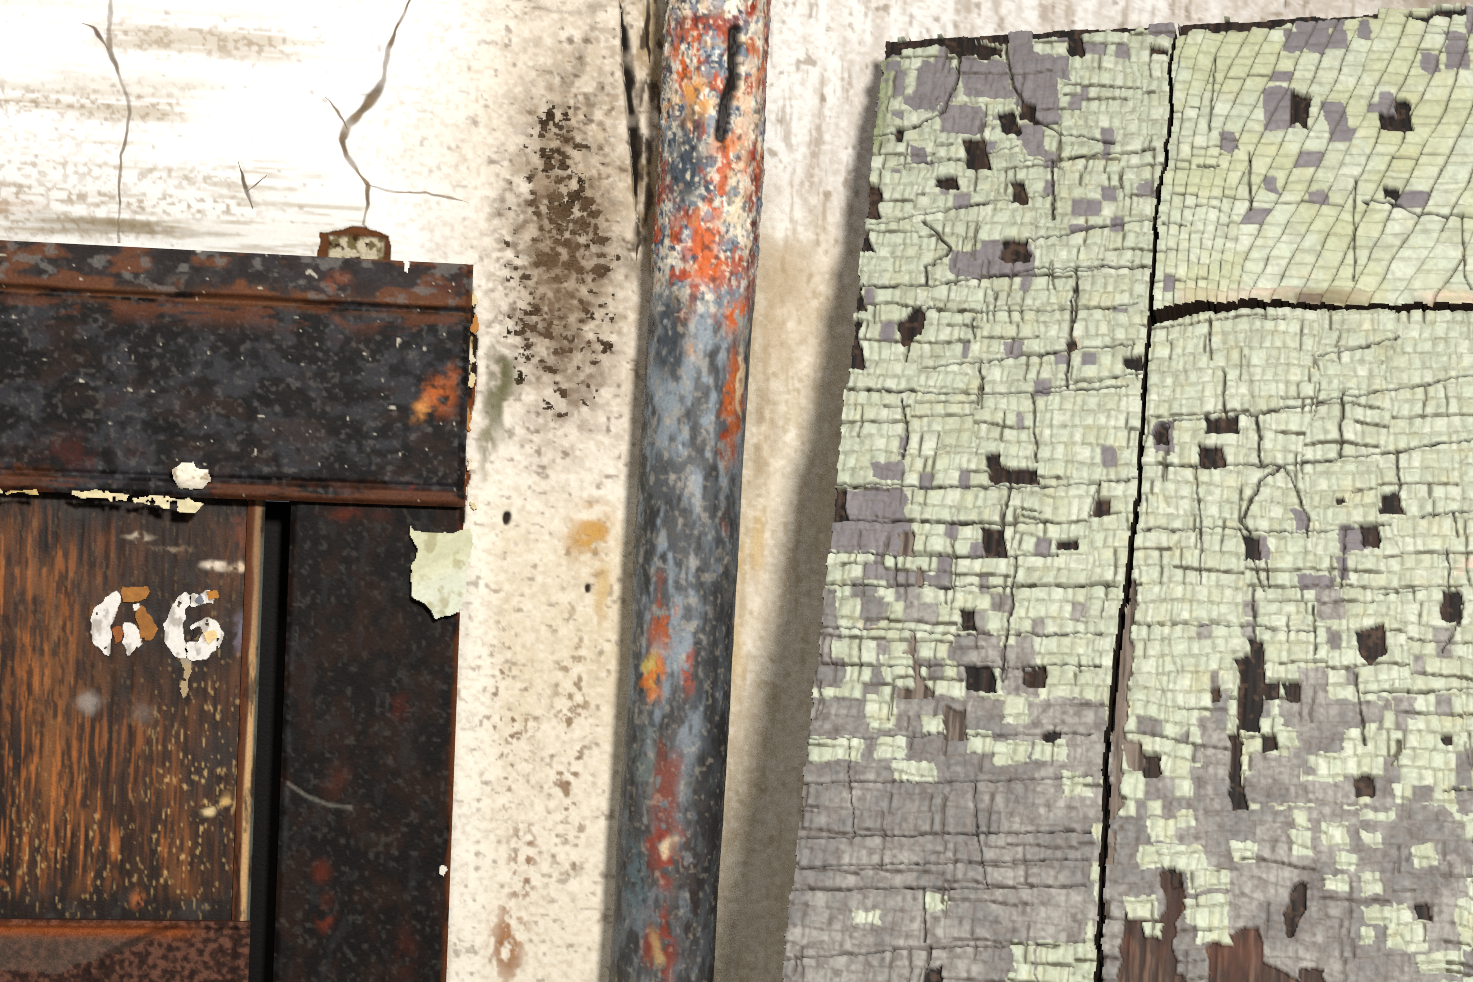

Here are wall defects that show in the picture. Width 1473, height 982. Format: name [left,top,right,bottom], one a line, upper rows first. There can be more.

crack [82,23,119,75]
crack [388,0,411,48]
crack [118,123,128,205]
crack [325,83,462,228]
damp [482,356,512,454]